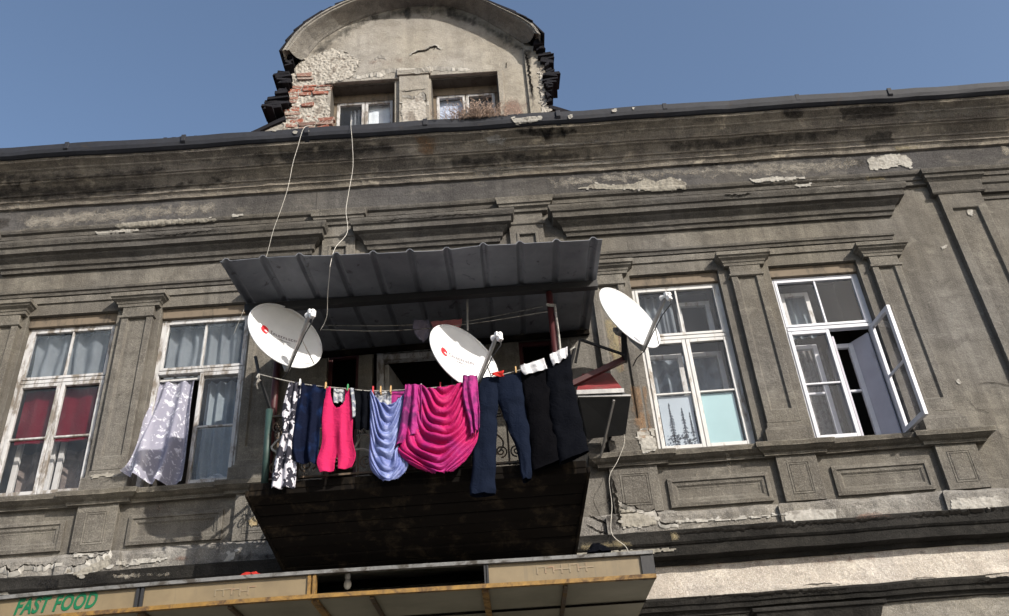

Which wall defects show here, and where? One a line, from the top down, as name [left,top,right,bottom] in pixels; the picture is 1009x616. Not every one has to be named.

crack [316,44,474,105]
spalling [272,48,360,134]
peeling [400,96,428,122]
damp [865,131,909,150]
damp [0,168,214,230]
damp [458,127,674,185]
peeling [578,177,687,192]
damp [686,158,870,187]
peeling [749,176,812,188]
peeling [867,154,913,170]
crack [588,477,1004,534]
crack [0,550,161,577]